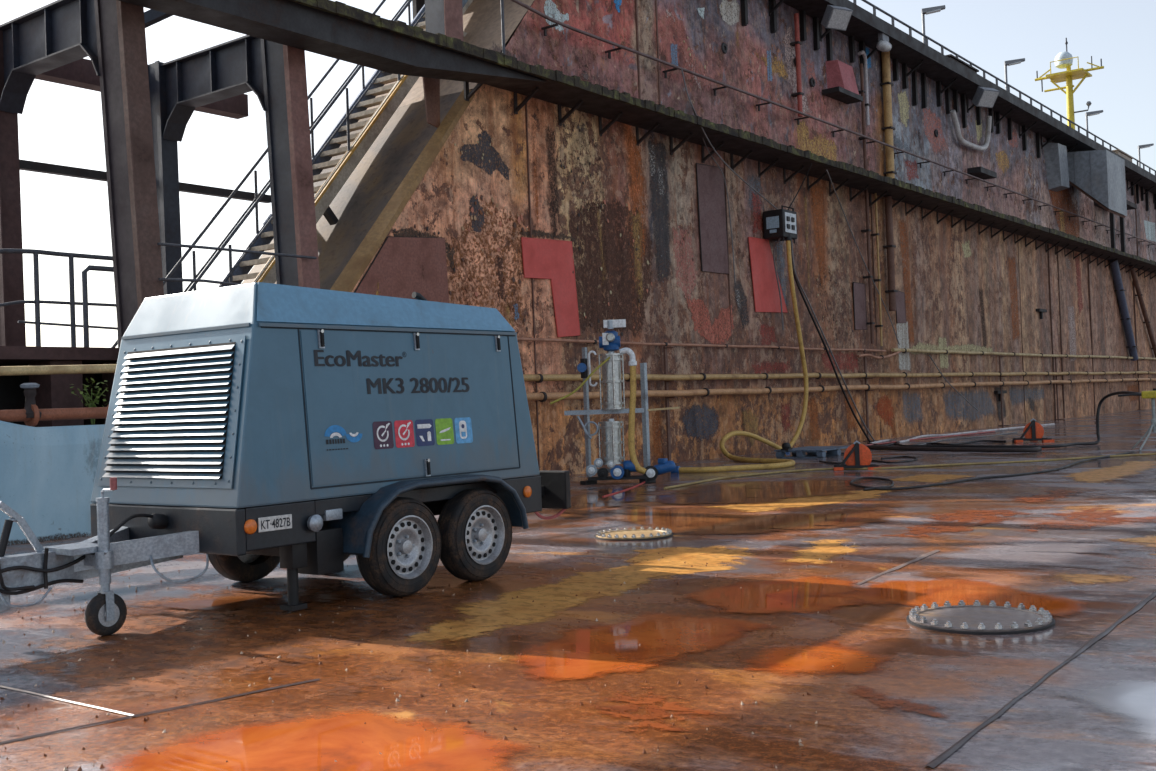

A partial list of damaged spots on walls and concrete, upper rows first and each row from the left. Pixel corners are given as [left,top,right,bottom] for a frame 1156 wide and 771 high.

corrosion [784,26,812,116]
peeling [454,130,510,182]
peeling [393,194,534,331]
corrosion [569,135,653,338]
corrosion [899,221,917,342]